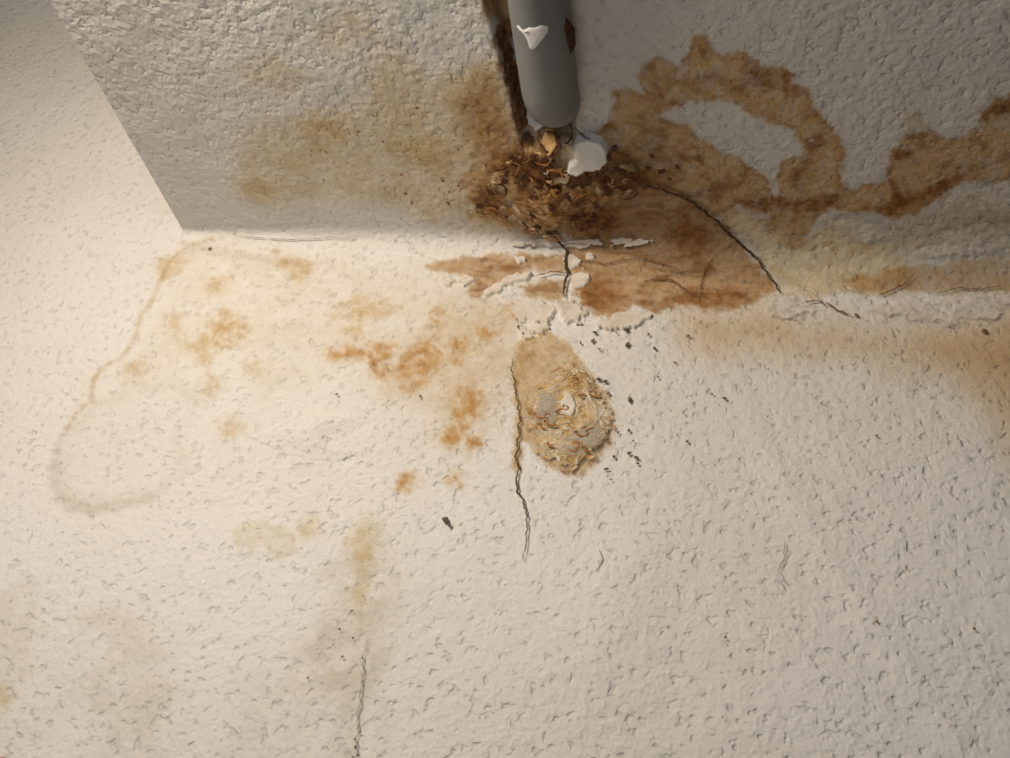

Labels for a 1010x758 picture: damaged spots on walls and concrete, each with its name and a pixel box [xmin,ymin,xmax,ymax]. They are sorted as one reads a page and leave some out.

corrosion [468,17,679,242]
crack [536,167,781,300]
water stain [723,197,904,296]
crack [807,300,851,315]
crack [941,284,1000,292]
crack [511,357,528,559]